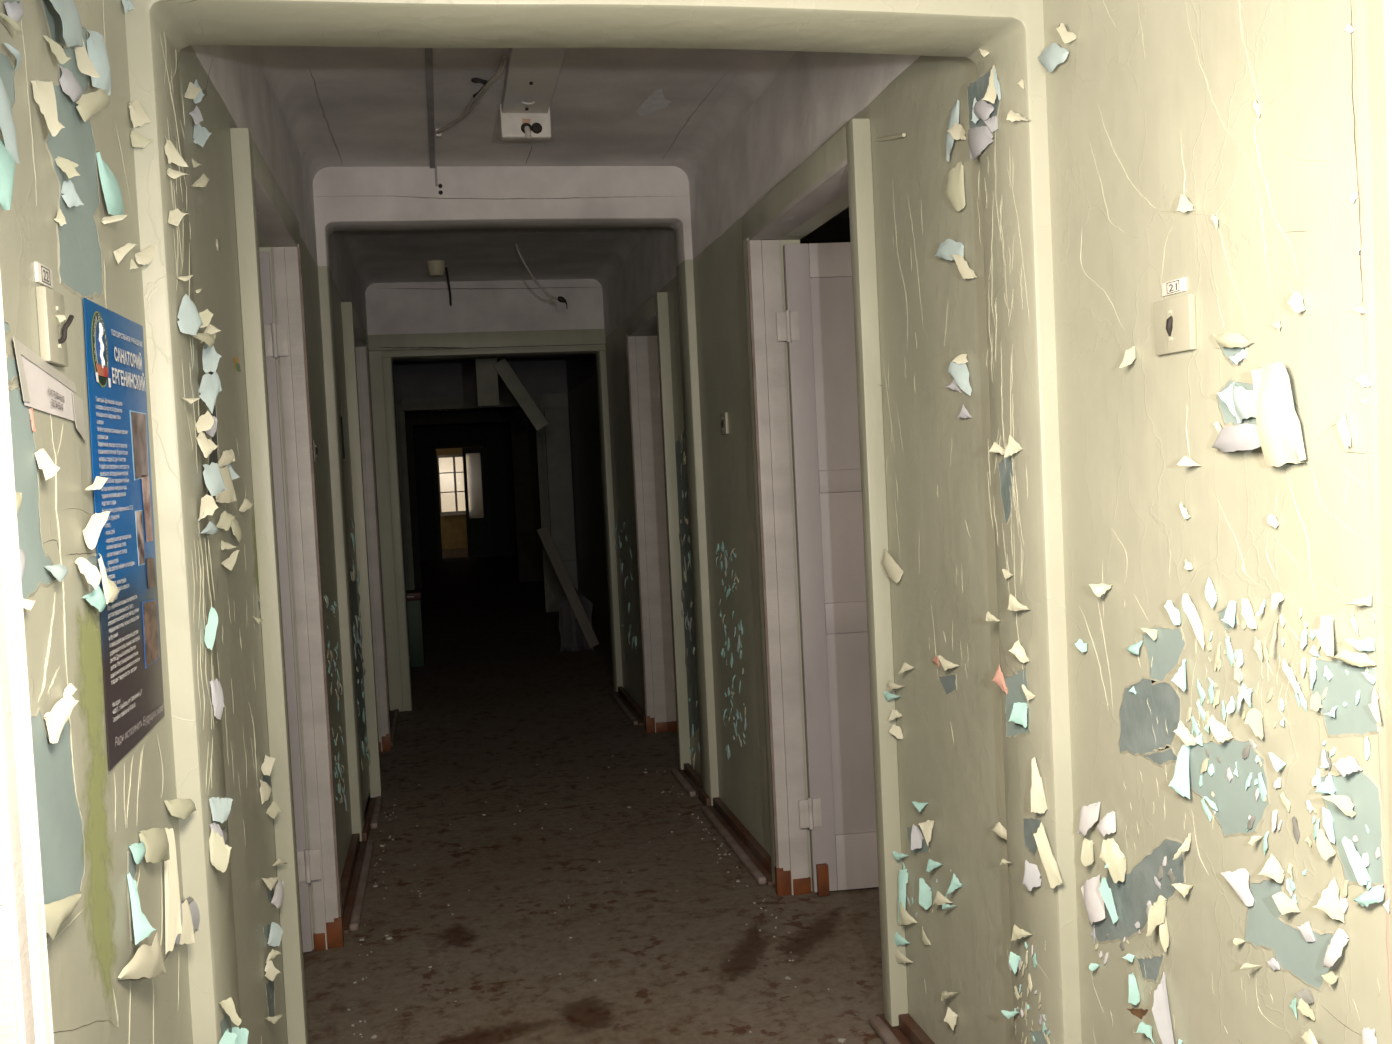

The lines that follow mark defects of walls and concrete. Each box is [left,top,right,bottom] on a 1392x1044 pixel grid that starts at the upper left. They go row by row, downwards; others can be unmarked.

peeling [0,0,156,300]
peeling [128,33,254,571]
peeling [945,49,1030,211]
crack [1080,0,1336,342]
peeling [4,318,120,946]
mould [78,612,114,994]
peeling [53,795,233,1044]
peeling [219,859,288,1044]
peeling [893,801,962,964]
peeling [991,640,1035,739]
peeling [991,757,1063,891]
peeling [1075,0,1392,1044]